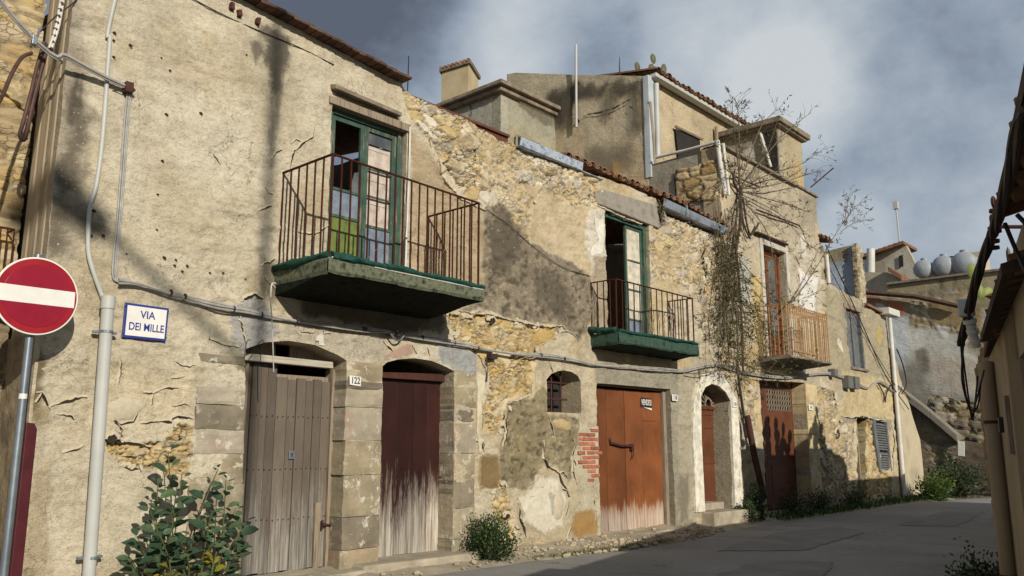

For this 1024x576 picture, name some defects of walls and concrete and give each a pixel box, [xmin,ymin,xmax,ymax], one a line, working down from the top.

crack [584,97,634,117]
crack [258,124,315,211]
flaking render [402,86,605,256]
crack [34,355,196,470]
flaking render [104,420,195,480]
flaking render [445,310,568,454]
crack [542,416,596,539]
flaking render [574,426,602,482]
peeling [491,476,725,563]